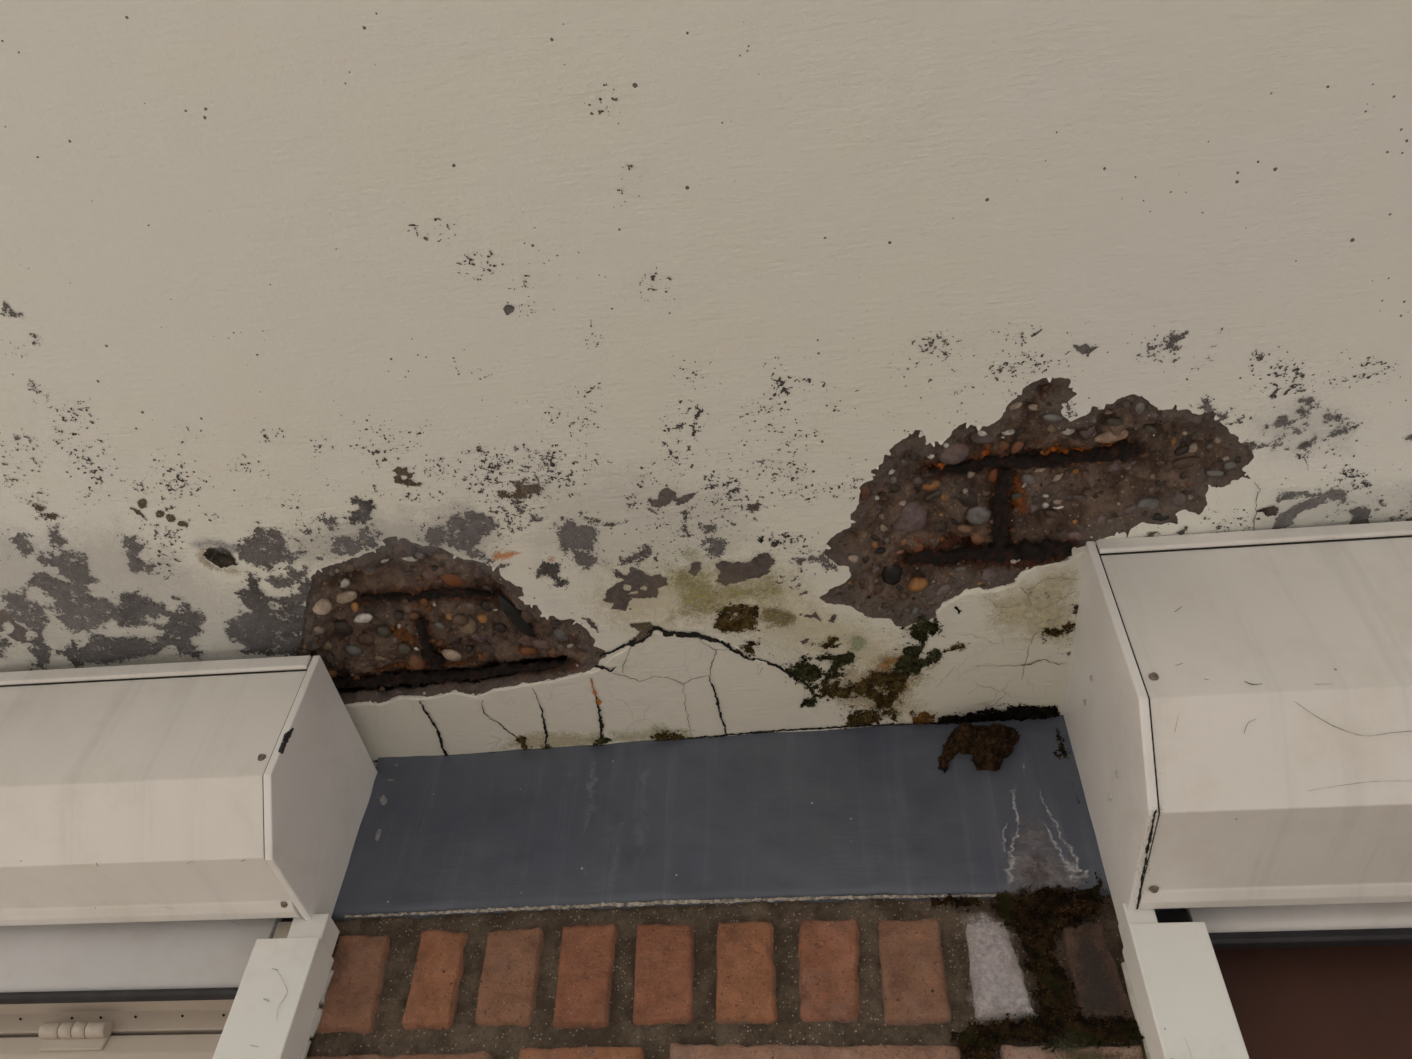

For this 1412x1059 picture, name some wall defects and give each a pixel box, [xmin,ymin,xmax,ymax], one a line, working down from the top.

peeling [0,301,23,318]
spalling [0,322,1412,705]
rust [904,440,1140,573]
rust [360,587,495,602]
damp [673,554,795,626]
rust [331,617,566,690]
crack [419,688,548,756]
crack [589,626,946,746]